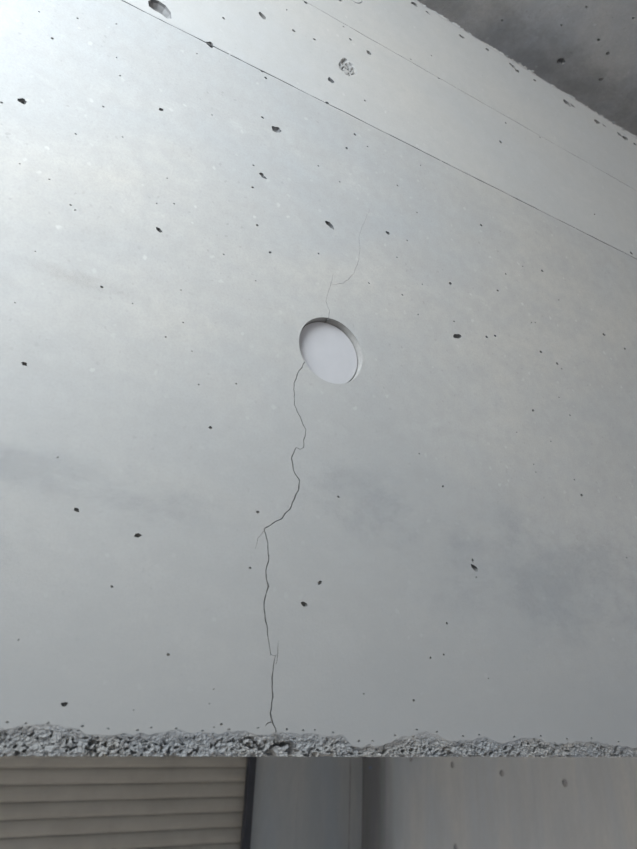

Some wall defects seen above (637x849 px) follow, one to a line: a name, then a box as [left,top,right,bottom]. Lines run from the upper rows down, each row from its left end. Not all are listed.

crack [255,363,306,741]